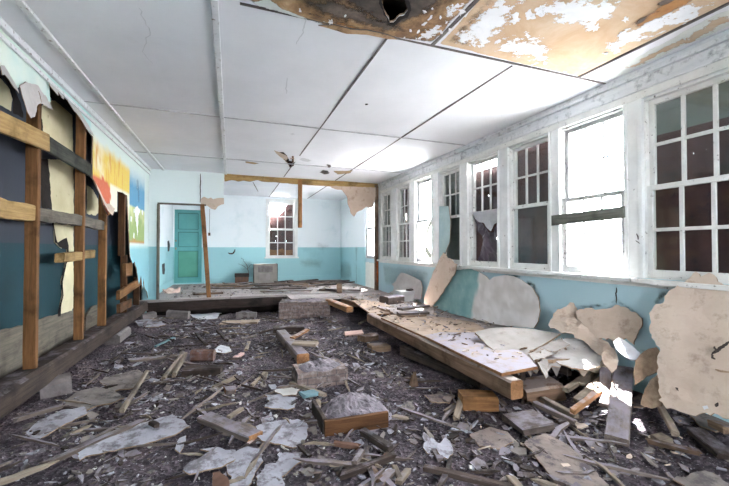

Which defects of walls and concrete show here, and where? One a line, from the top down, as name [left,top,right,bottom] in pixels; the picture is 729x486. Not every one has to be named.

peeling [254,0,306,19]
leakage [271,0,471,41]
peeling [404,0,729,79]